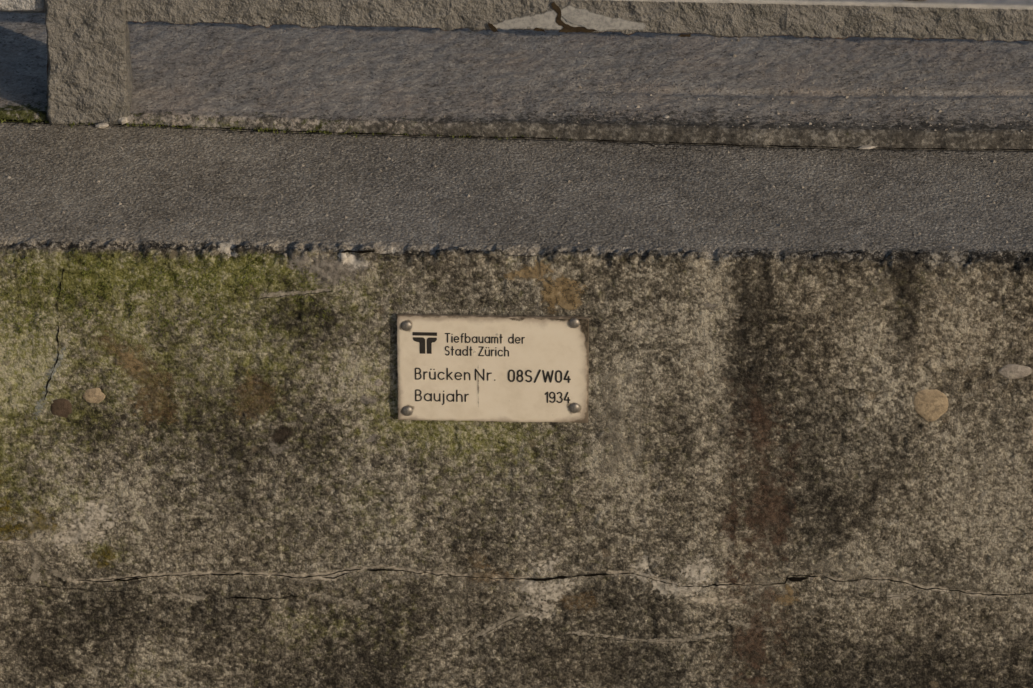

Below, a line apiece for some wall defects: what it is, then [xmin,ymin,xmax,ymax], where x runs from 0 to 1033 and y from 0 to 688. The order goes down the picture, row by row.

peeling [488,6,646,32]
crack [32,269,65,420]
crack [0,540,1033,640]
crack [567,620,773,644]